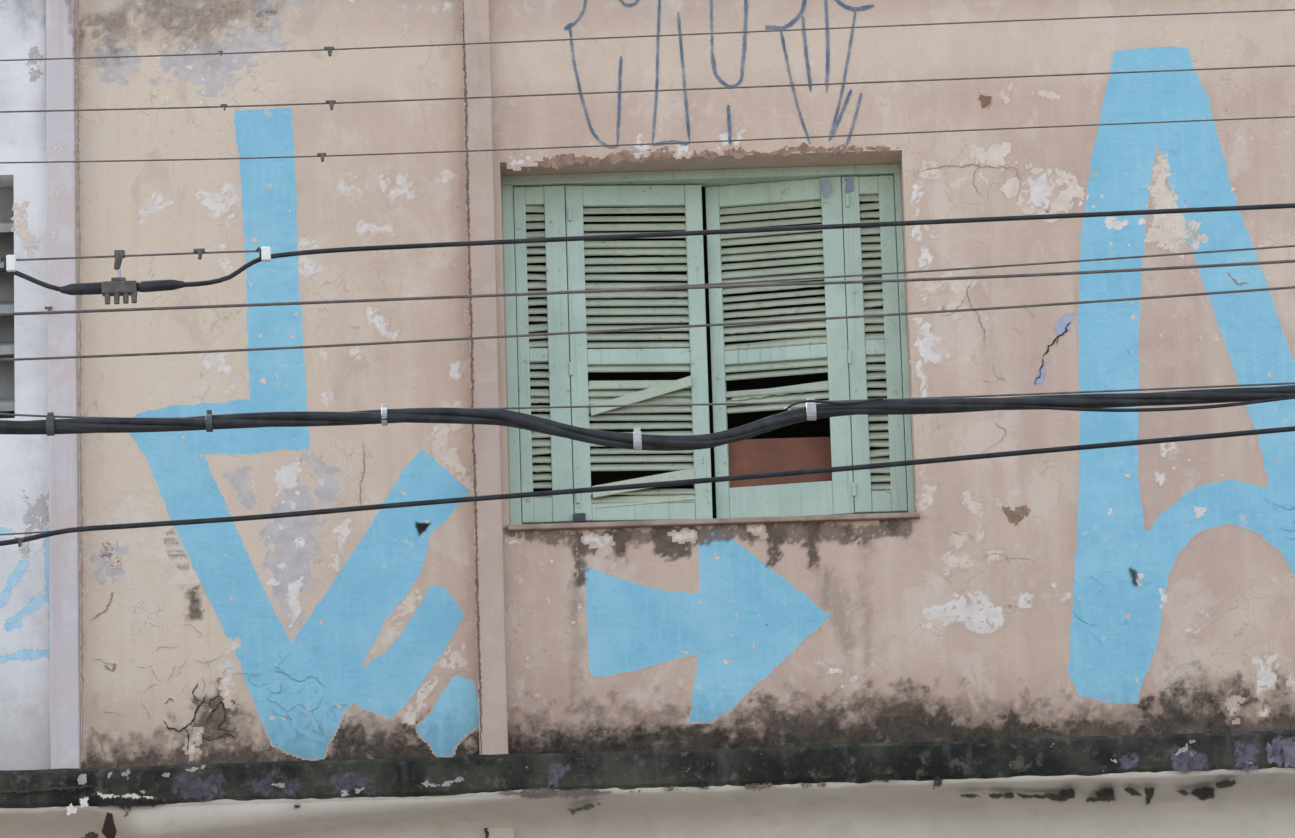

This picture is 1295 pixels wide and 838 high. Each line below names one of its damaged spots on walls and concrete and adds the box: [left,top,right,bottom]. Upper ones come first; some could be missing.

peeling [88,0,300,106]
crack [918,158,1021,199]
peeling [905,140,1218,397]
crack [76,0,349,755]
crack [948,279,1070,384]
peeling [215,446,356,635]
water stain [504,519,912,586]
peeling [915,466,1082,638]
water stain [508,675,1295,768]
peeling [1110,753,1138,770]
peeling [1170,736,1295,801]